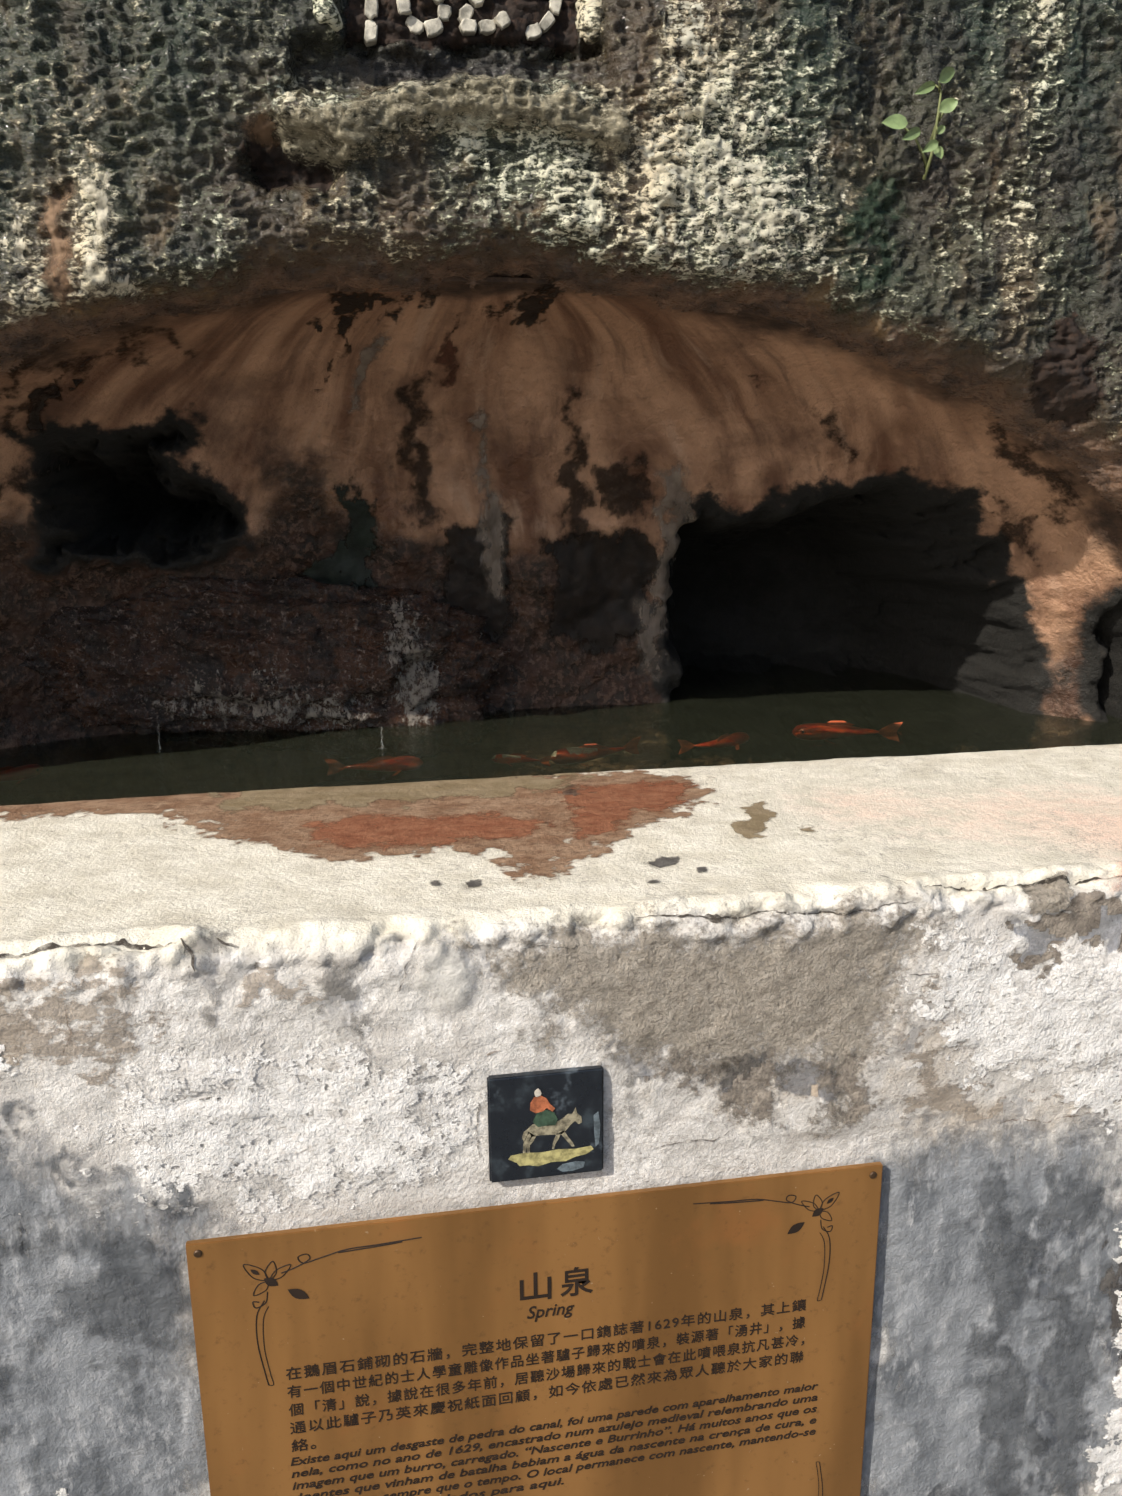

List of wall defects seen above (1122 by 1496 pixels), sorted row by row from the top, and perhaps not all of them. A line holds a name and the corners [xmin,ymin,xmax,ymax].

crack [0,938,235,972]
rust [0,769,719,883]
rust [731,801,777,839]
spalling [443,871,1122,1138]
crack [637,871,1122,923]
leakage [0,1101,209,1496]
leakage [860,1127,1122,1496]
peeling [1081,1290,1122,1494]